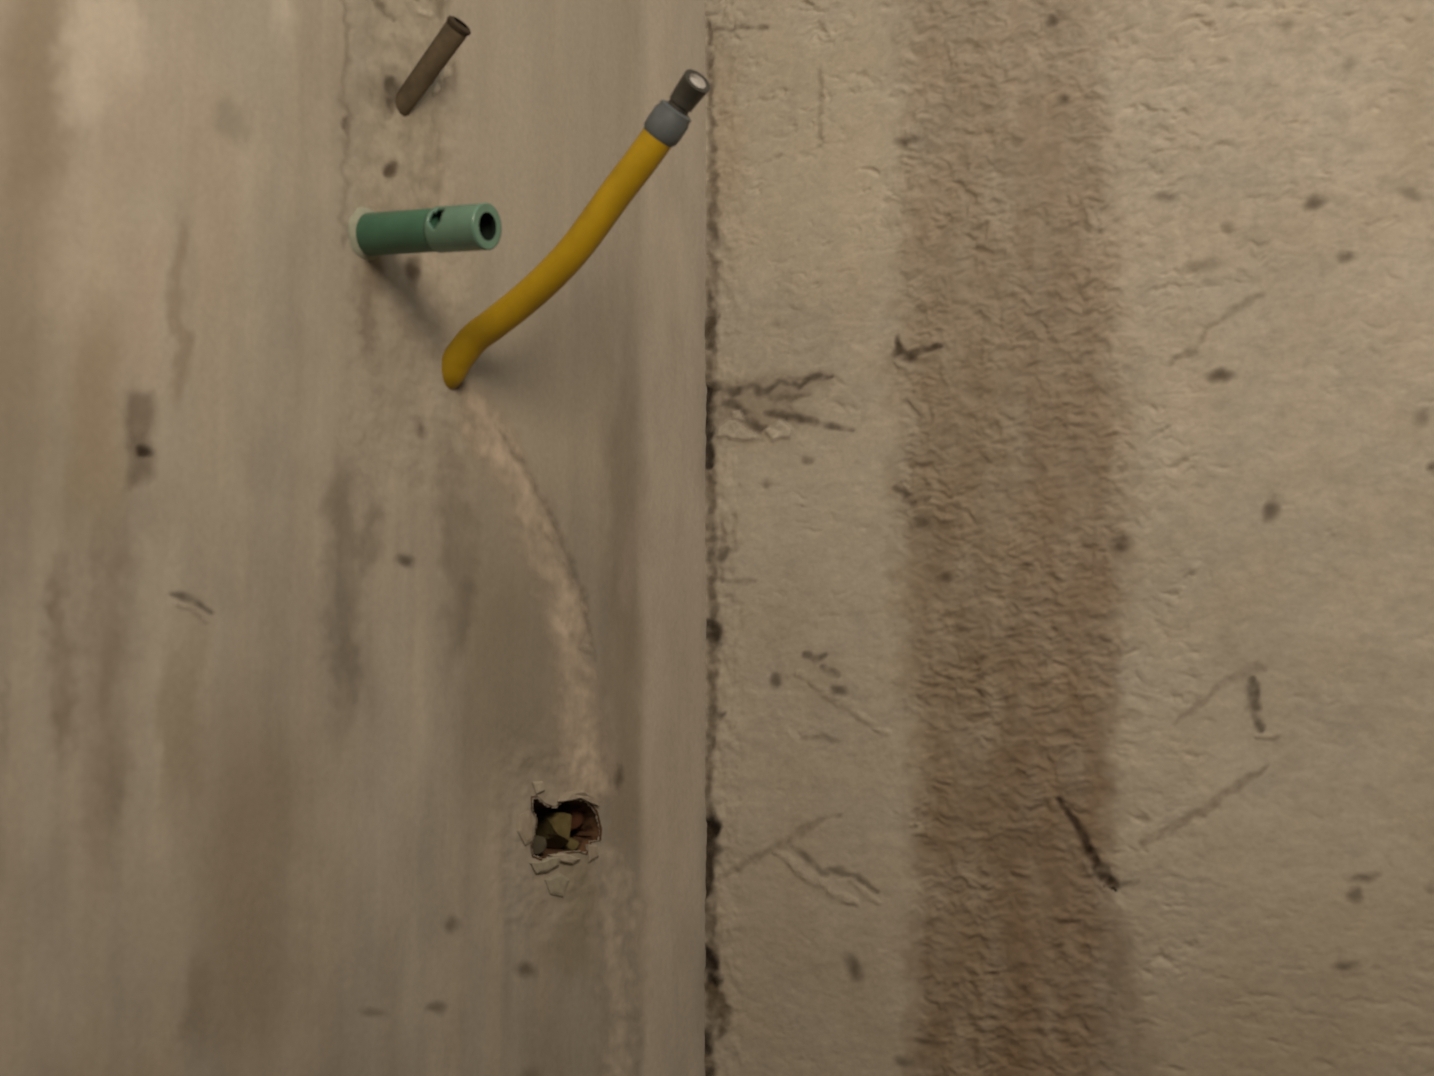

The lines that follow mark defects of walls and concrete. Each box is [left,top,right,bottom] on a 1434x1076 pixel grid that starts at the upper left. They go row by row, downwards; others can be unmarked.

spalling [517,781,602,897]
crack [1057,797,1115,888]